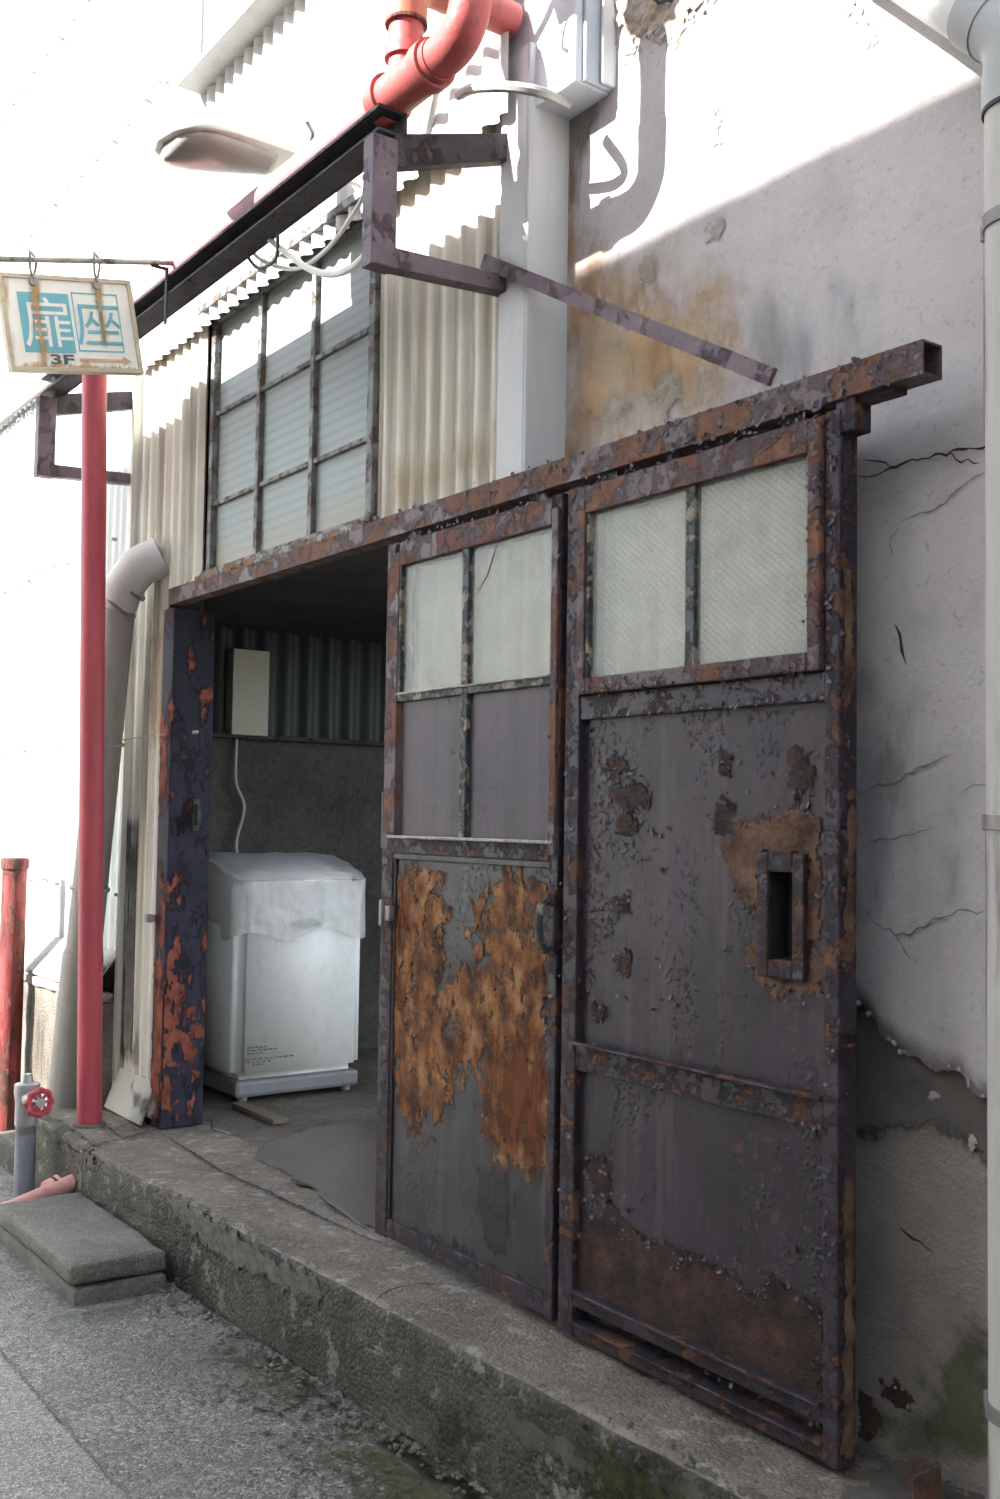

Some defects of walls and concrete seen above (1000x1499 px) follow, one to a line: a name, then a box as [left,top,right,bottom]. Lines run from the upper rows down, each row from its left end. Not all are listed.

flaking render [614,0,716,68]
crack [857,446,985,558]
peeling [172,342,917,1116]
crack [859,756,948,794]
rust [150,870,205,1125]
rust [393,860,549,1183]
rust [712,744,825,1001]
flaking render [856,997,987,1165]
crack [864,909,985,962]
water stain [186,1292,341,1411]
water stain [369,1430,480,1499]
water stain [471,1342,766,1499]